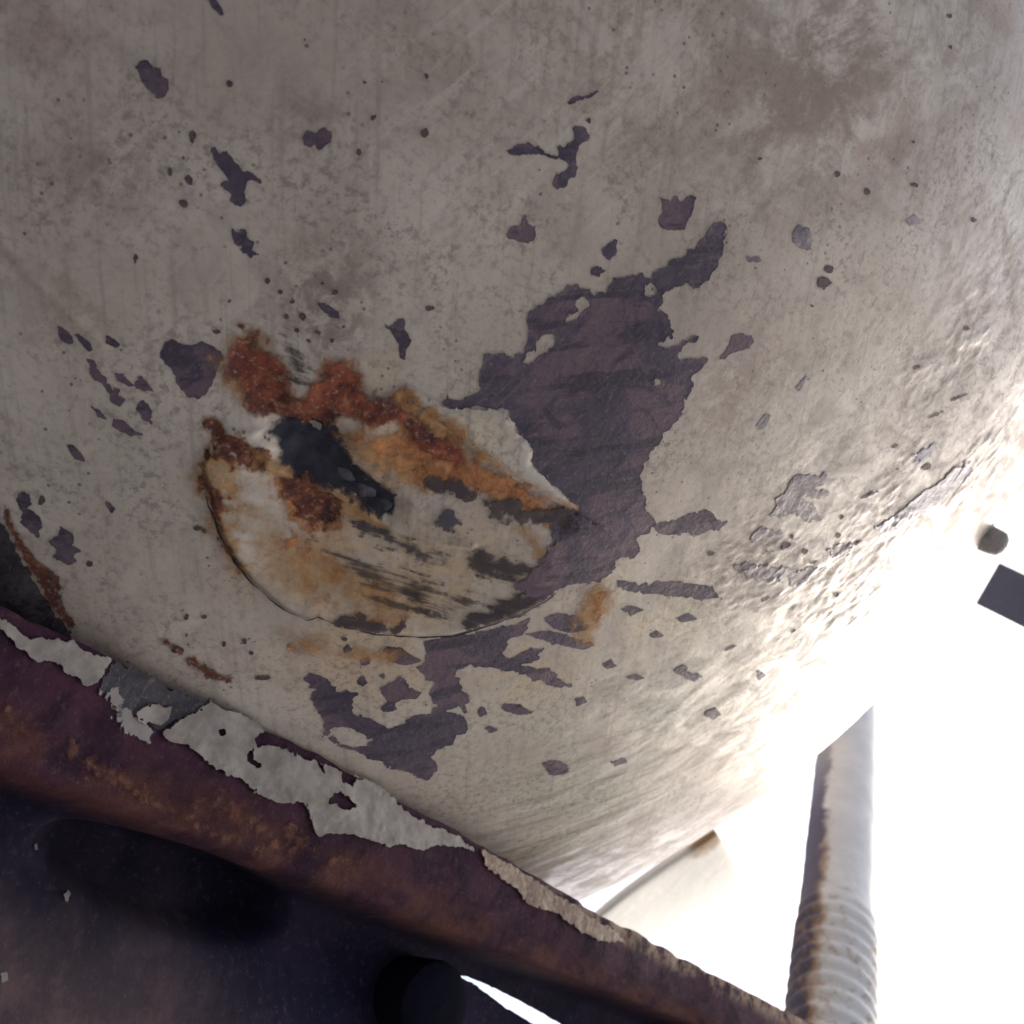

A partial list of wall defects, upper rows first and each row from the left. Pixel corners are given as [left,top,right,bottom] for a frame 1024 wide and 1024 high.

peeling [210,147,262,207]
peeling [507,118,591,190]
spalling [58,326,153,437]
peeling [160,318,223,399]
corrosion [220,324,557,558]
peeling [405,221,754,601]
corrosion [193,417,408,626]
peeling [0,619,112,686]
corrosion [161,640,233,683]
peeling [303,613,594,780]
corrosion [576,586,612,644]
corrosion [70,739,315,858]